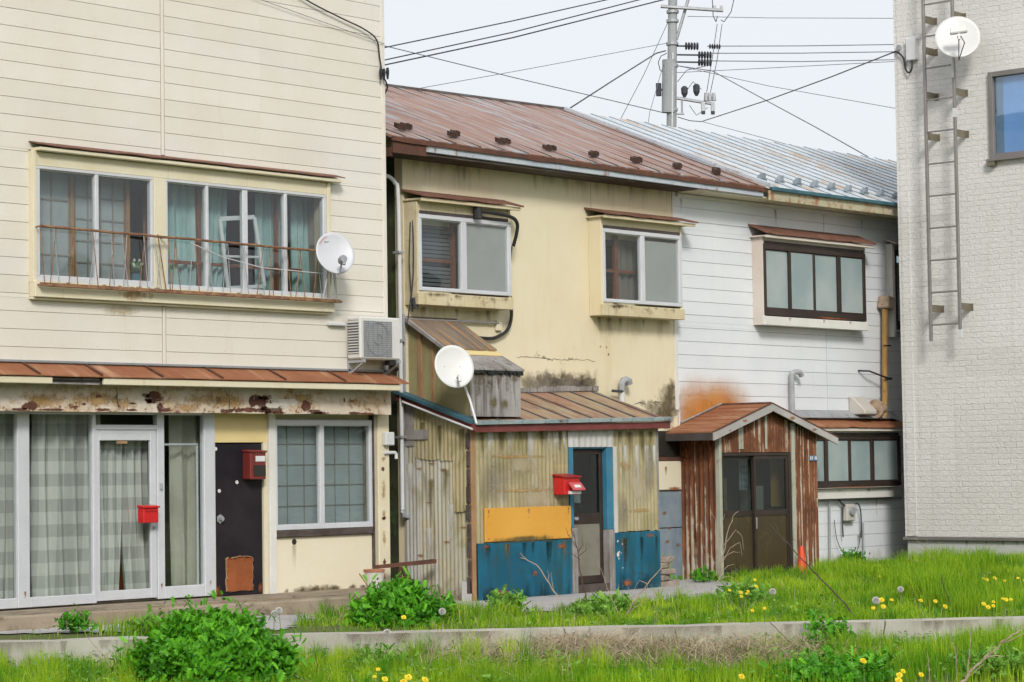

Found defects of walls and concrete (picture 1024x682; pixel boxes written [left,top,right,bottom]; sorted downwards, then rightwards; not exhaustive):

leakage [514,373,595,388]
peeling [12,401,63,411]
peeling [127,391,172,413]
peeling [220,395,329,414]
leakage [642,383,677,422]
rust [682,389,738,423]